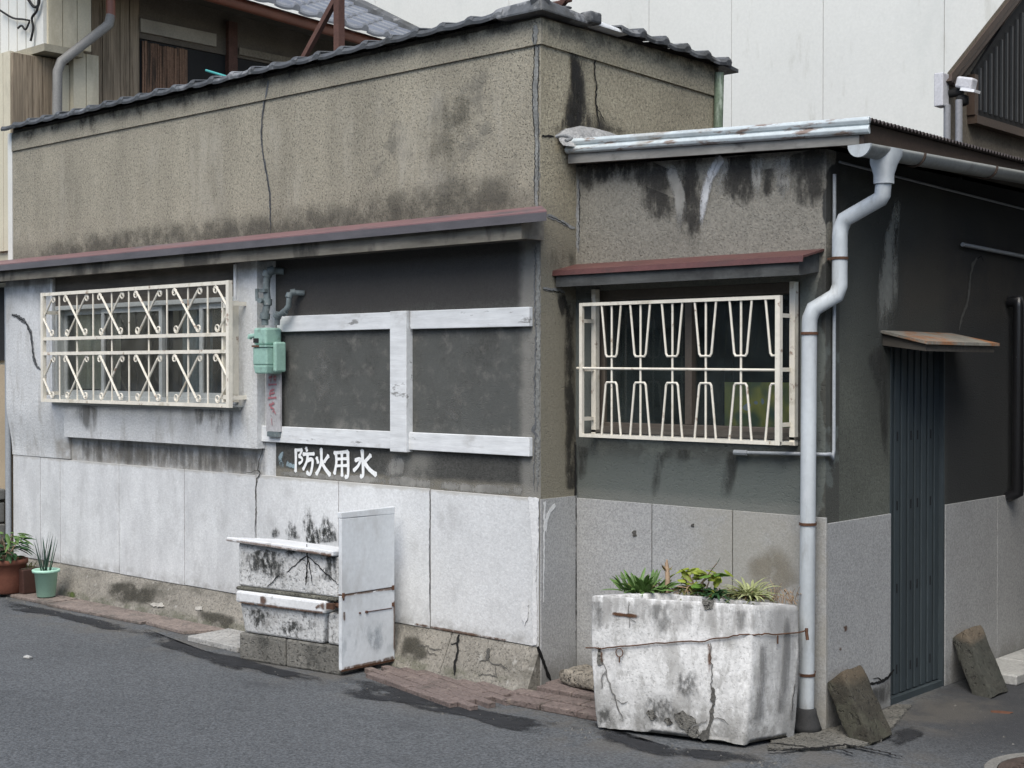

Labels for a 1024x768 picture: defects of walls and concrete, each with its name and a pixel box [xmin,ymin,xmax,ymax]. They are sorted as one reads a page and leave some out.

leakage [562,53,621,131]
crack [594,60,605,122]
crack [260,80,271,233]
leakage [581,148,826,235]
crack [12,314,41,370]
crack [246,442,264,525]
leakage [249,515,336,580]
crack [417,634,508,677]